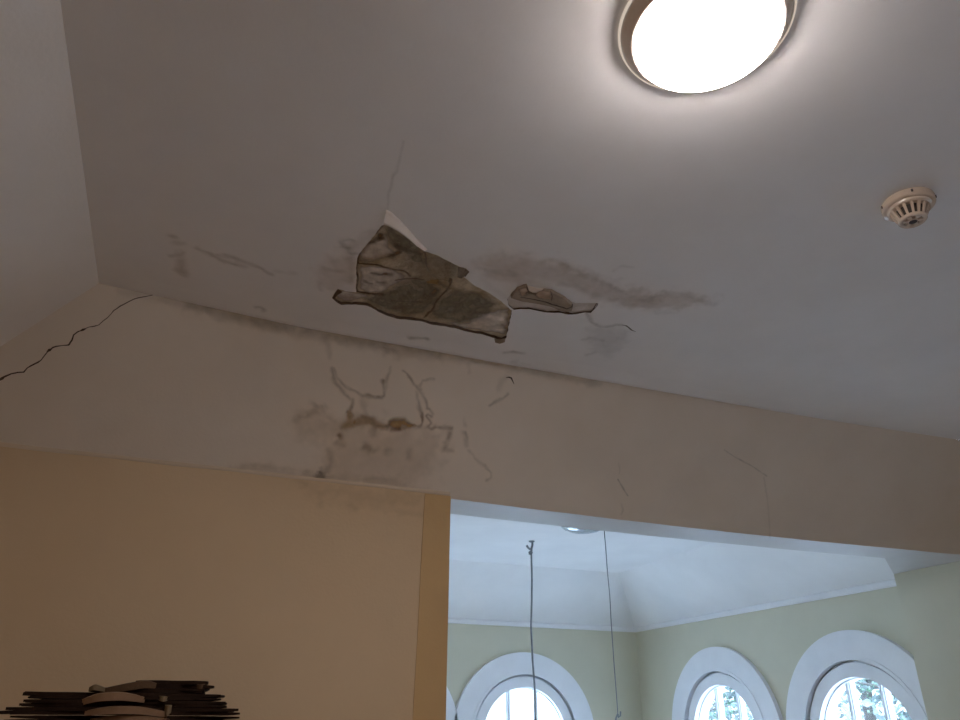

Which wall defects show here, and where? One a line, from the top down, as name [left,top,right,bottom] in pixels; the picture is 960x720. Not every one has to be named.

peeling [384,210,427,251]
crack [0,295,152,381]